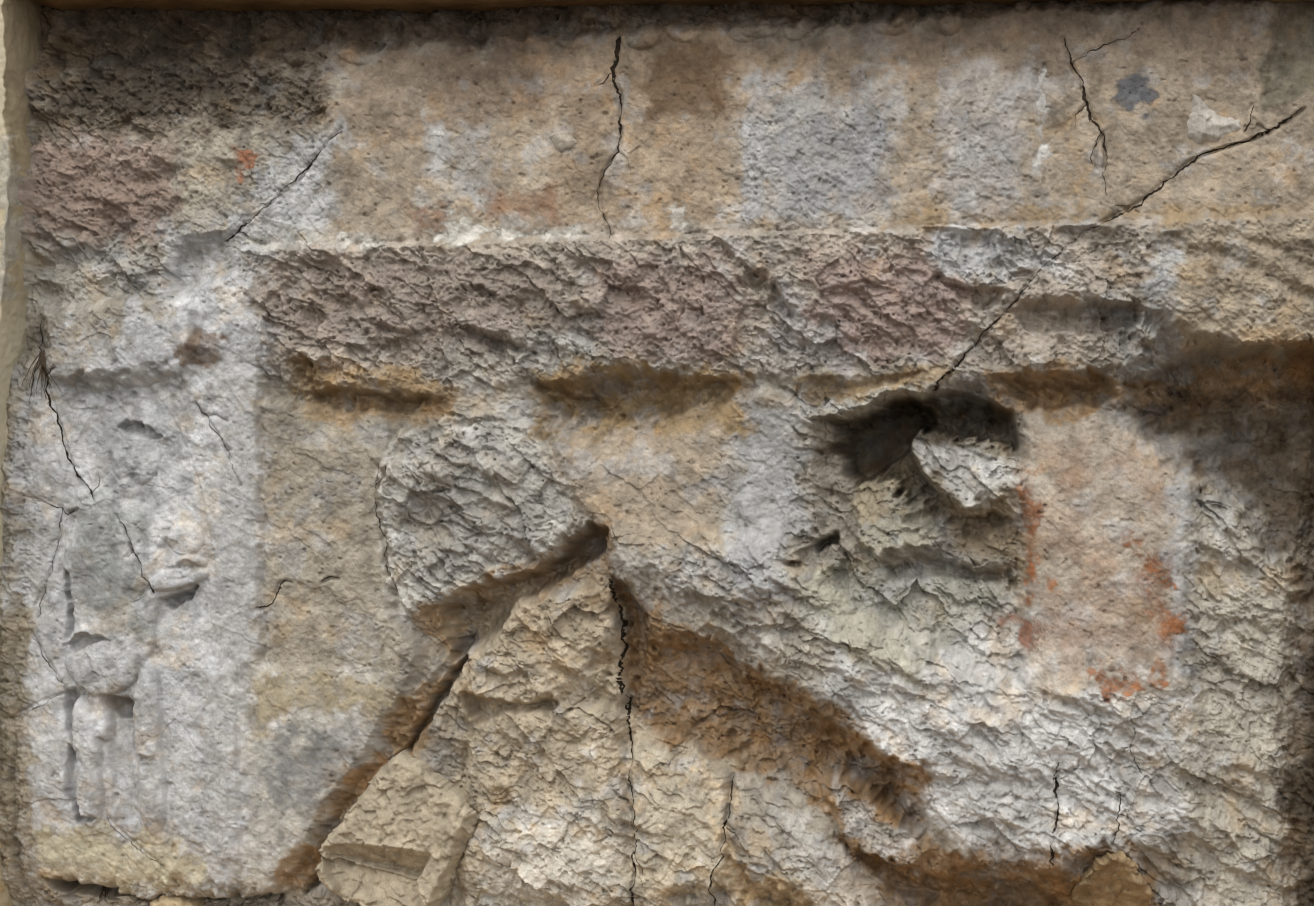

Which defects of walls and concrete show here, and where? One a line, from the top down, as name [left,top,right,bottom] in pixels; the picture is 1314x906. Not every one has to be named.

crack [227,132,340,241]
crack [597,36,630,238]
crack [934,28,1301,391]
crack [11,318,154,718]
rust [1001,616,1045,651]
rust [1018,488,1042,604]
rust [1089,667,1168,702]
rust [1125,543,1186,648]